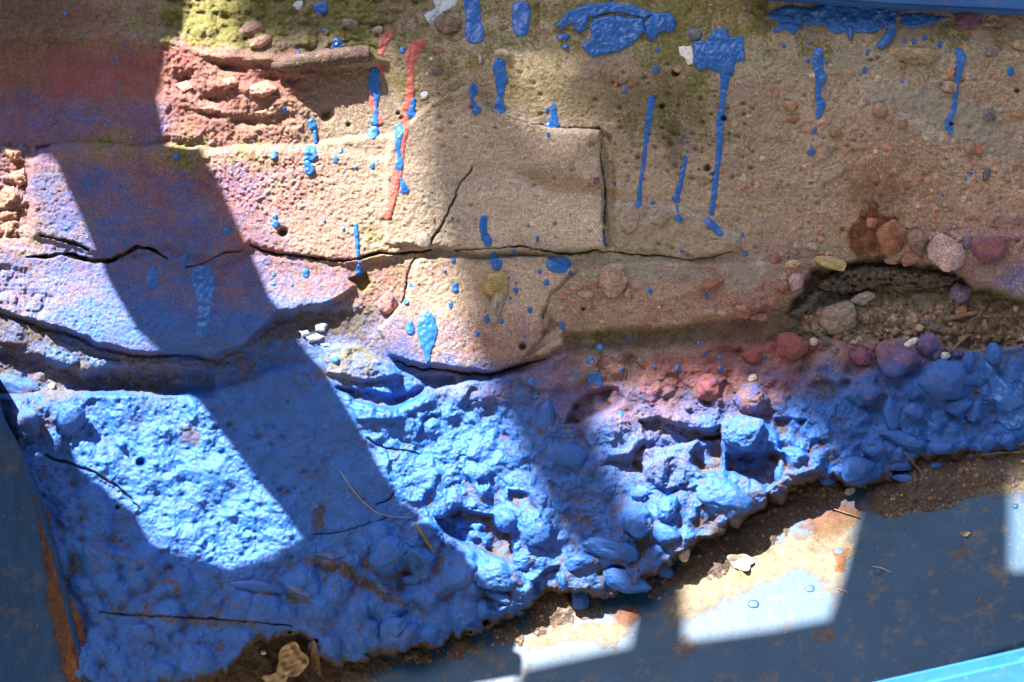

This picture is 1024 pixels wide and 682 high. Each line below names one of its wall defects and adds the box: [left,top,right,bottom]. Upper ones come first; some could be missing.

crack [30,235,165,264]
crack [188,170,472,304]
crack [460,111,724,260]
crack [49,456,139,509]
rust [32,495,86,682]
crack [106,613,286,625]